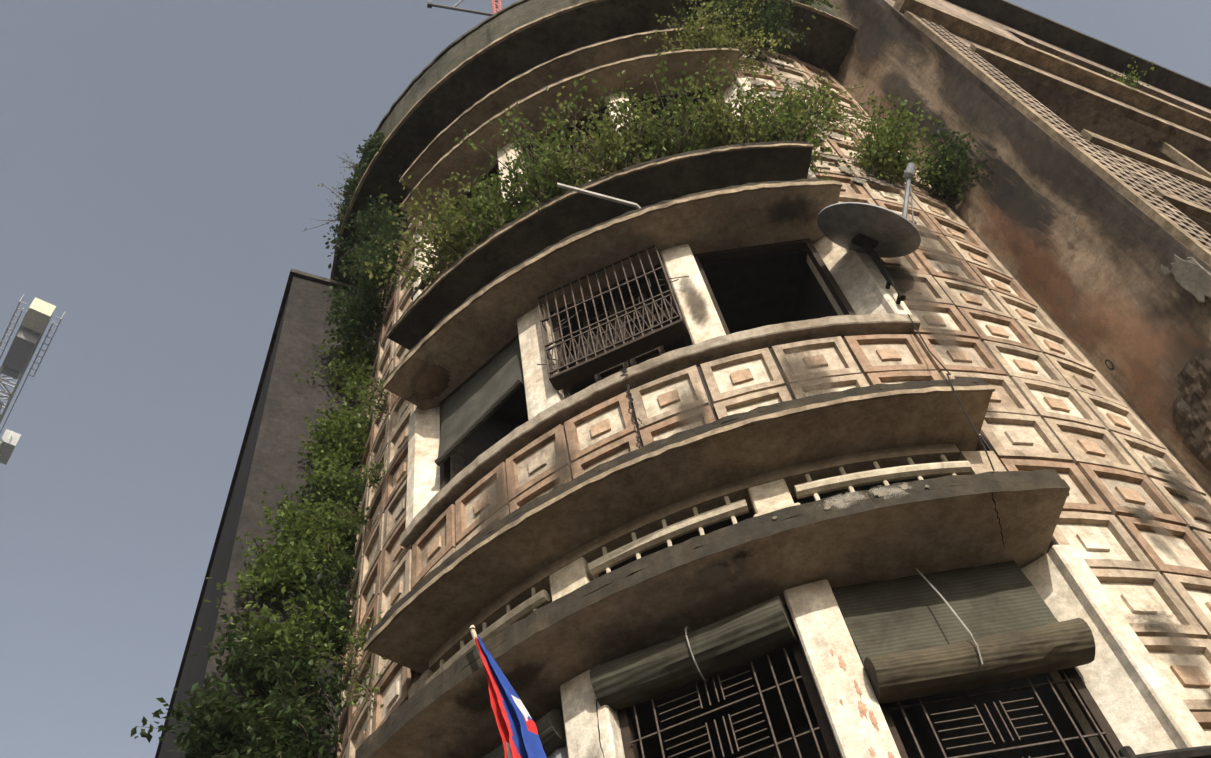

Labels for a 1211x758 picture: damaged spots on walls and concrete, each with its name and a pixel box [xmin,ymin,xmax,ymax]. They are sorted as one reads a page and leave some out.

damp [846,0,1211,334]
damp [683,281,707,322]
damp [884,256,958,352]
flaking render [1160,254,1211,302]
spalling [824,485,909,510]
crack [992,492,1005,547]